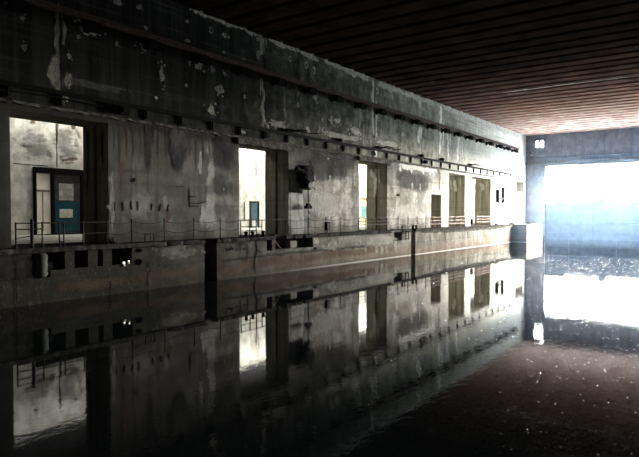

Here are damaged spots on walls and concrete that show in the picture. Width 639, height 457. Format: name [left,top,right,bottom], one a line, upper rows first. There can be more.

spalling [207,85,224,116]
spalling [267,119,289,130]
leakage [114,118,235,171]
leakage [398,172,428,190]